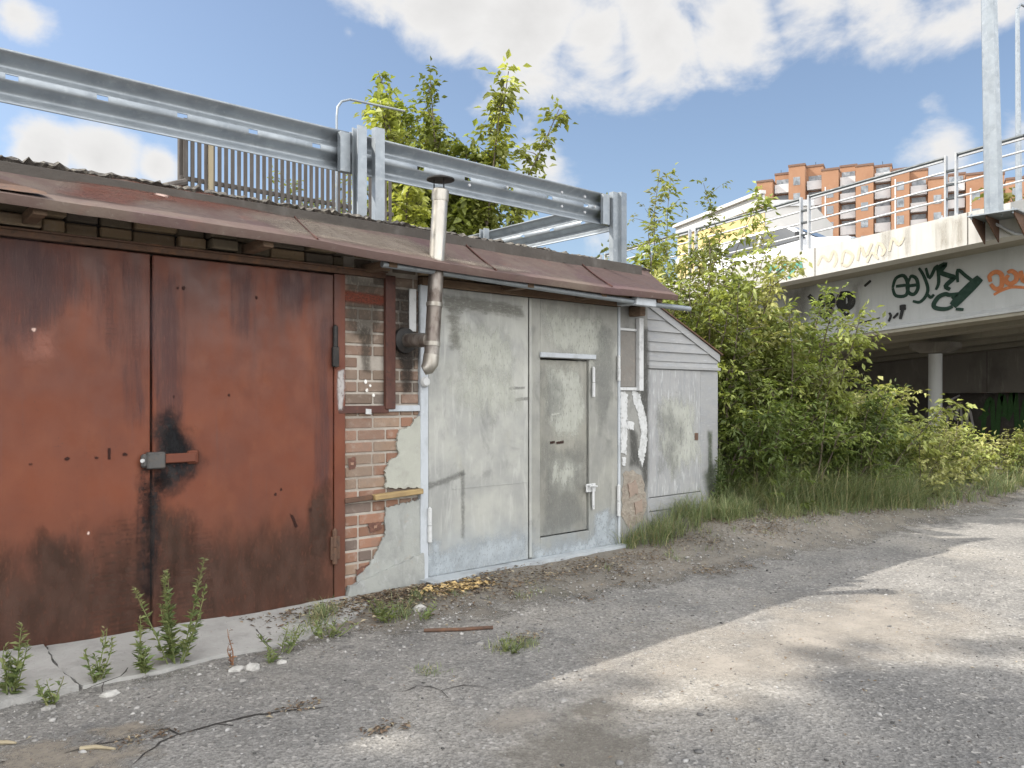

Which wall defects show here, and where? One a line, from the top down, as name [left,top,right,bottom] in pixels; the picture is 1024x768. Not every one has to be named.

spalling [620,390,648,528]
peeling [266,498,1011,673]